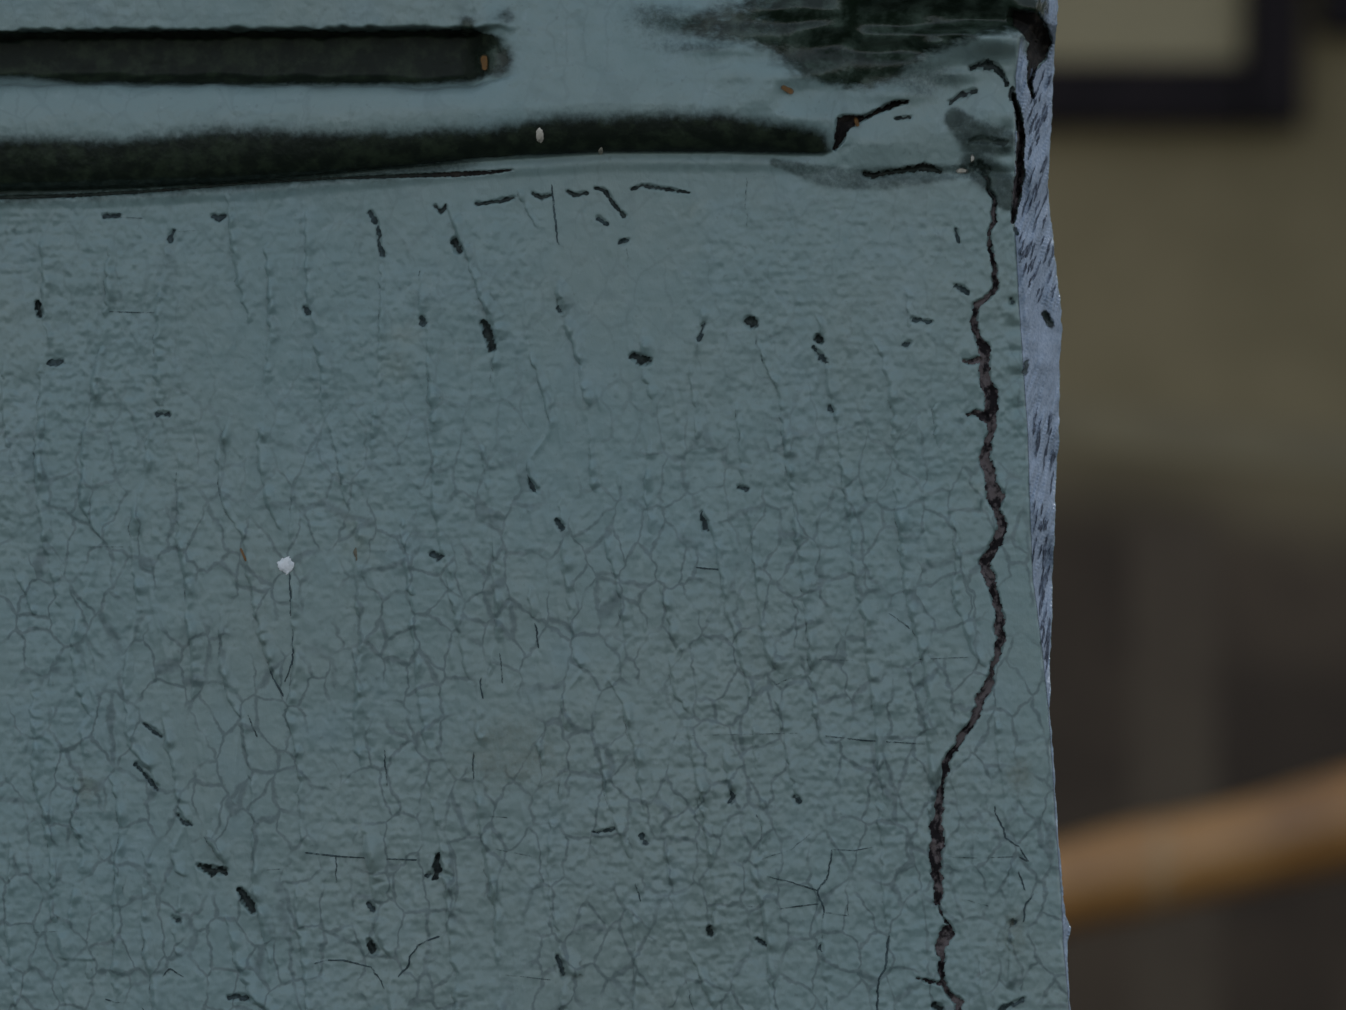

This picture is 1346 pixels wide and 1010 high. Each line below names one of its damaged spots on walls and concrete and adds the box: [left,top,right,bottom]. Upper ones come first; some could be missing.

peeling [949,89,978,105]
crack [833,100,909,150]
crack [863,163,942,179]
peeling [475,197,514,206]
peeling [532,187,626,226]
peeling [434,199,515,352]
peeling [744,316,758,328]
peeling [970,0,1062,708]
crack [876,99,1031,1010]
crack [269,573,294,697]
crack [278,852,417,876]
crack [315,936,440,987]